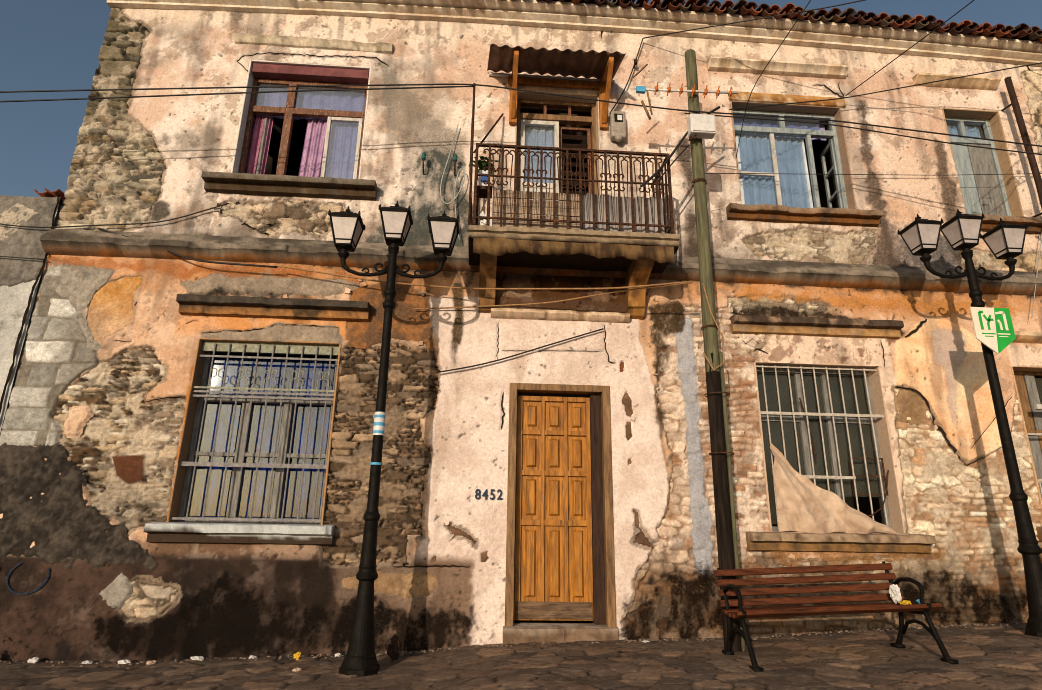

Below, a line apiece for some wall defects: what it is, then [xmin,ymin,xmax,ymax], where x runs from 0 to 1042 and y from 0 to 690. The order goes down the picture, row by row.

spalling [54,7,166,232]
spalling [210,199,346,238]
spalling [743,230,877,264]
spalling [0,259,186,534]
spalling [322,277,440,601]
spalling [622,305,723,641]
spalling [715,296,1042,637]
crack [881,319,1012,466]
spalling [121,578,179,618]
damp [94,561,357,660]
damp [374,596,473,652]
damp [621,569,723,640]